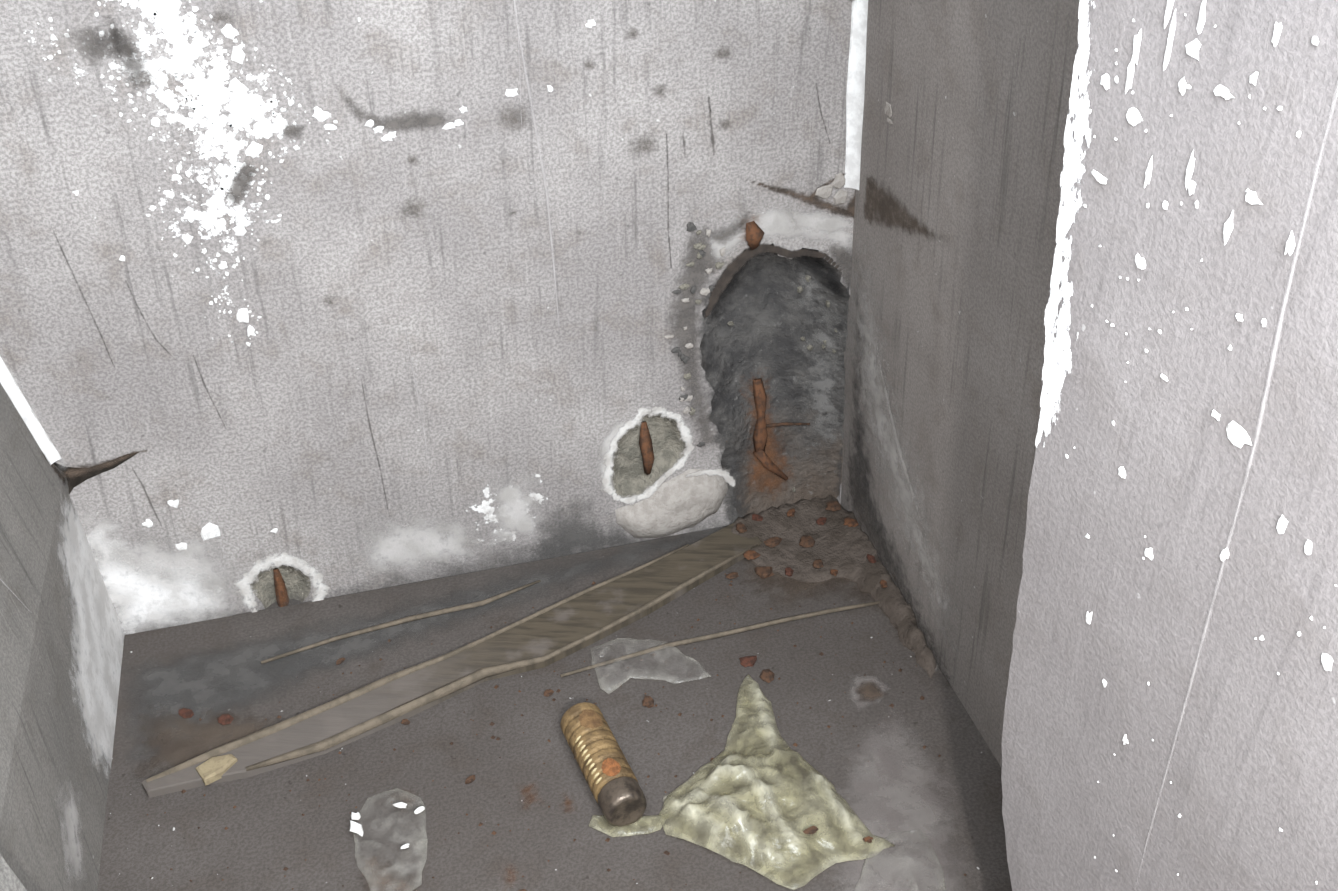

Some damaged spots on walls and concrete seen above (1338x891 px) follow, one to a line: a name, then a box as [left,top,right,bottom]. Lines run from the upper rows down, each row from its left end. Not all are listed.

peeling [1163,0,1217,71]
peeling [1213,72,1282,111]
crack [752,173,933,235]
peeling [1035,0,1147,448]
peeling [1144,150,1199,210]
peeling [1223,189,1263,245]
spalling [599,208,852,524]
peeling [1211,410,1252,448]
spalling [233,552,330,613]
efflorescence [58,503,240,767]
peeling [1321,653,1333,671]
efflorescence [61,787,82,883]